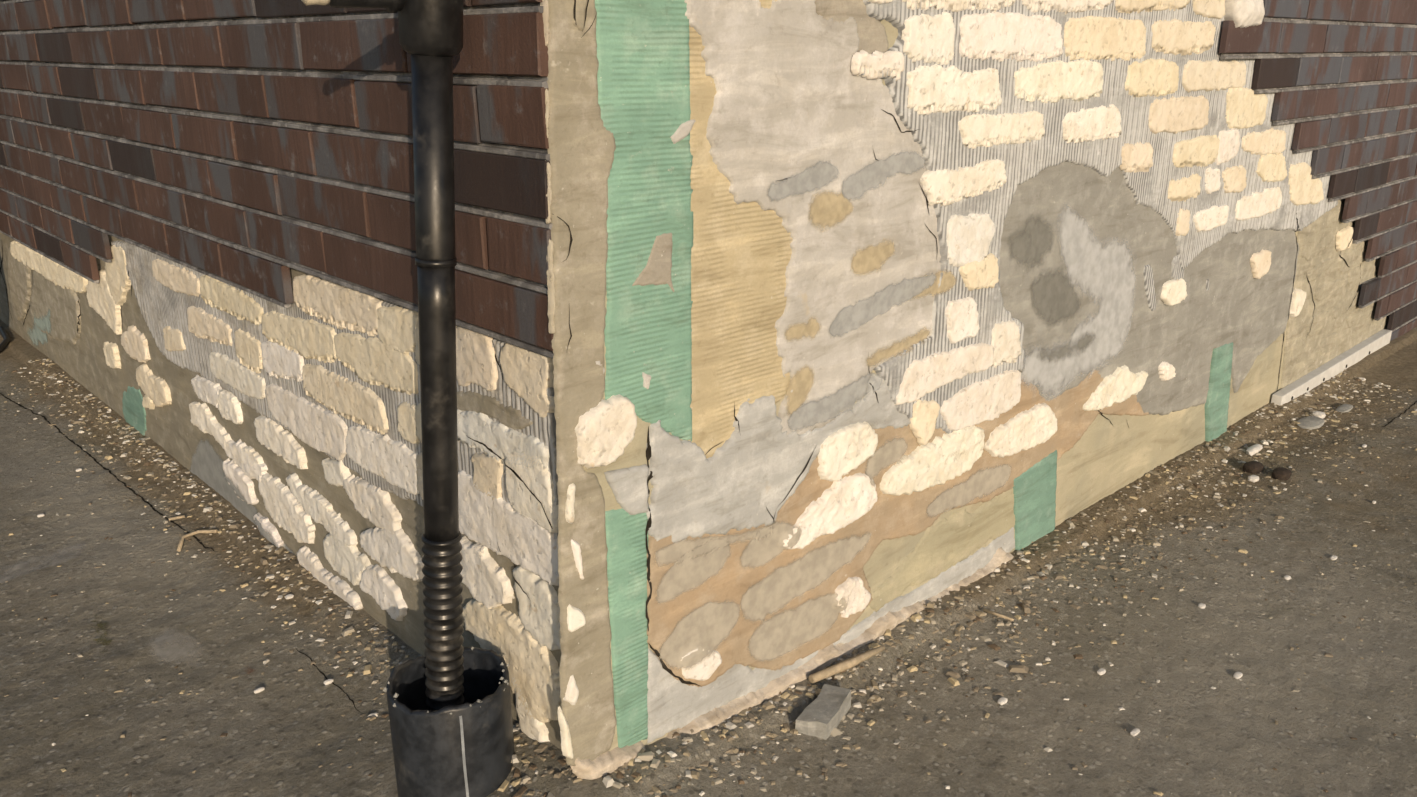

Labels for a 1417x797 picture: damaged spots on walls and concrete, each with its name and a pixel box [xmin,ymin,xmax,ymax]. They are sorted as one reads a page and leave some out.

crack [573,0,596,38]
flaking render [7,246,81,345]
spalling [111,241,423,507]
spalling [456,325,559,586]
crack [645,426,702,687]
spalling [570,0,1388,780]